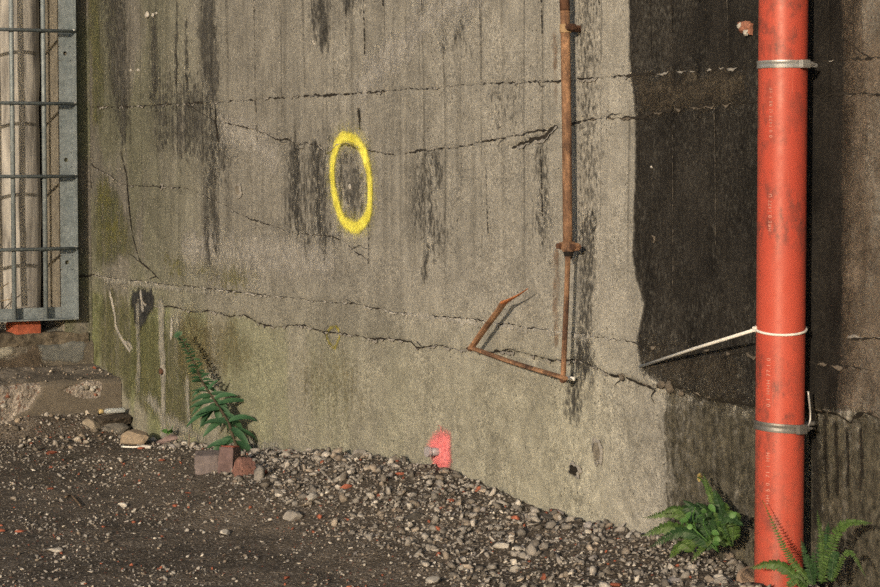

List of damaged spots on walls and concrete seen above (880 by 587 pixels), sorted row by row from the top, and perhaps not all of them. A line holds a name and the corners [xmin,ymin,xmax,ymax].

water stain [310,0,330,49]
water stain [284,131,367,260]
crack [79,151,756,360]
water stain [629,0,759,566]
water stain [803,0,880,587]
water stain [95,272,219,445]
crack [491,348,753,407]
crack [806,361,878,374]
crack [805,409,880,423]